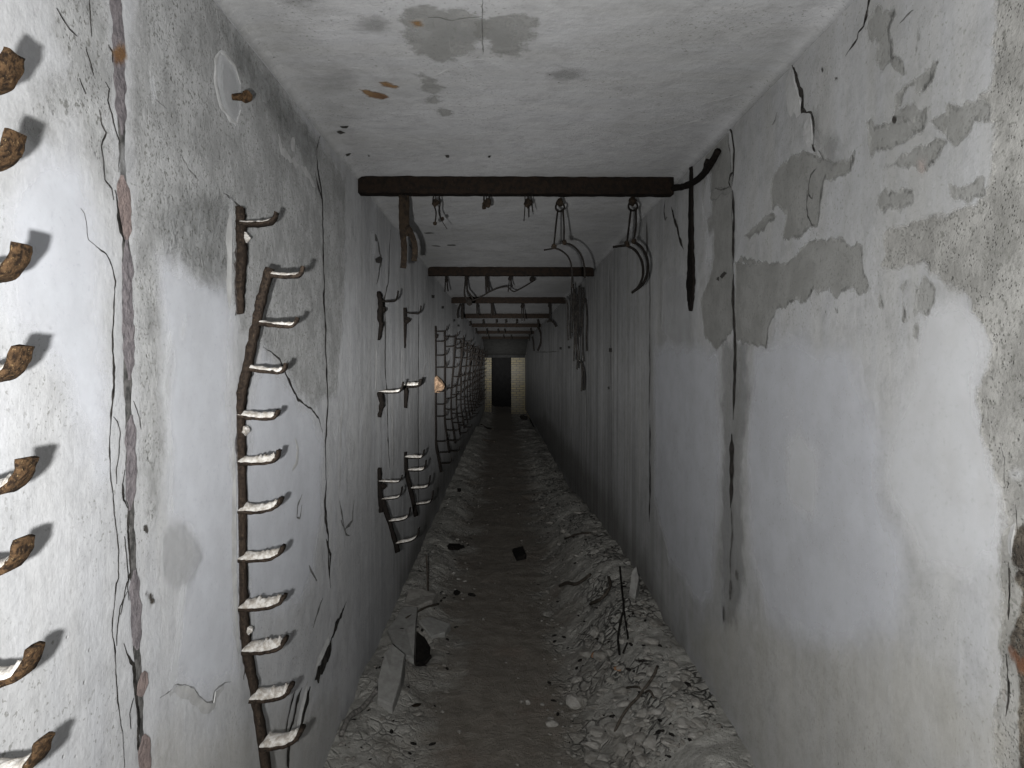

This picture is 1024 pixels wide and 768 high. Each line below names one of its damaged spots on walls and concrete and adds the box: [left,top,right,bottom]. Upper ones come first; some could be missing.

corrosion [114,46,126,62]
corrosion [362,82,398,99]
peeling [701,133,869,351]
crack [772,65,824,226]
crack [846,0,870,55]
crack [56,0,231,768]
crack [265,134,354,768]
spalling [867,0,1024,768]